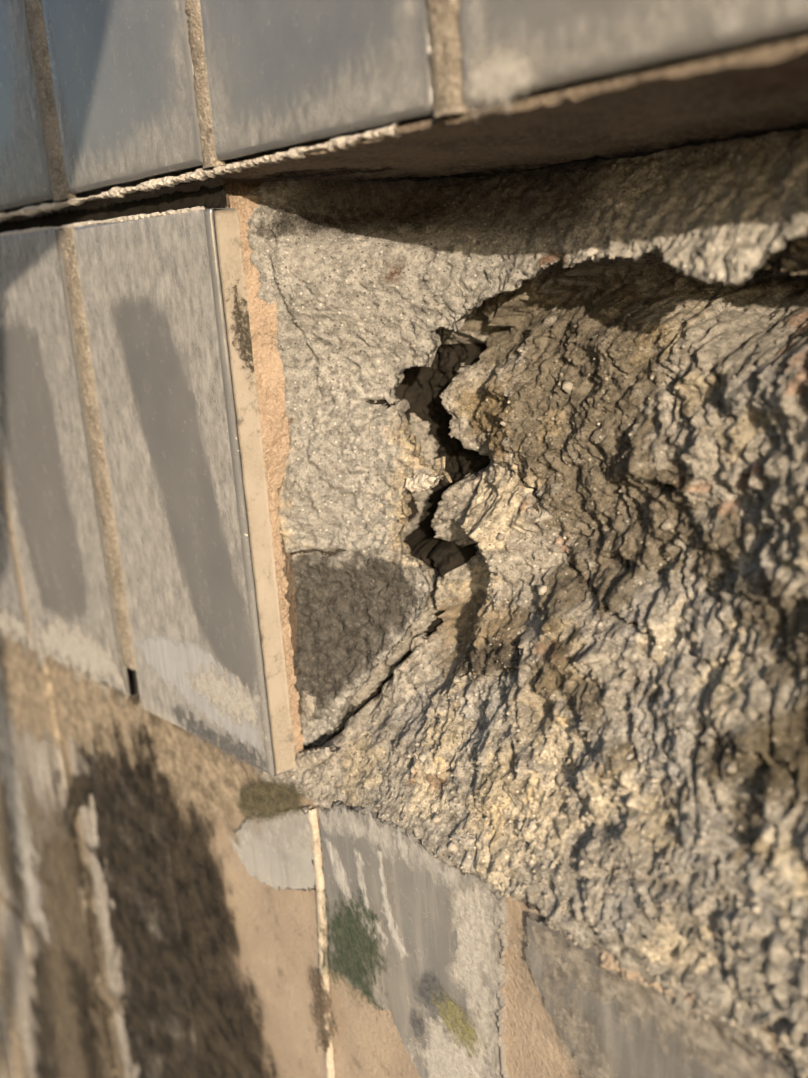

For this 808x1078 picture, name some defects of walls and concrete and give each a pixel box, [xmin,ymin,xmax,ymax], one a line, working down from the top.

crack [290,549,346,557]
crack [307,610,445,750]
crack [366,343,540,578]
spalling [230,129,808,1078]